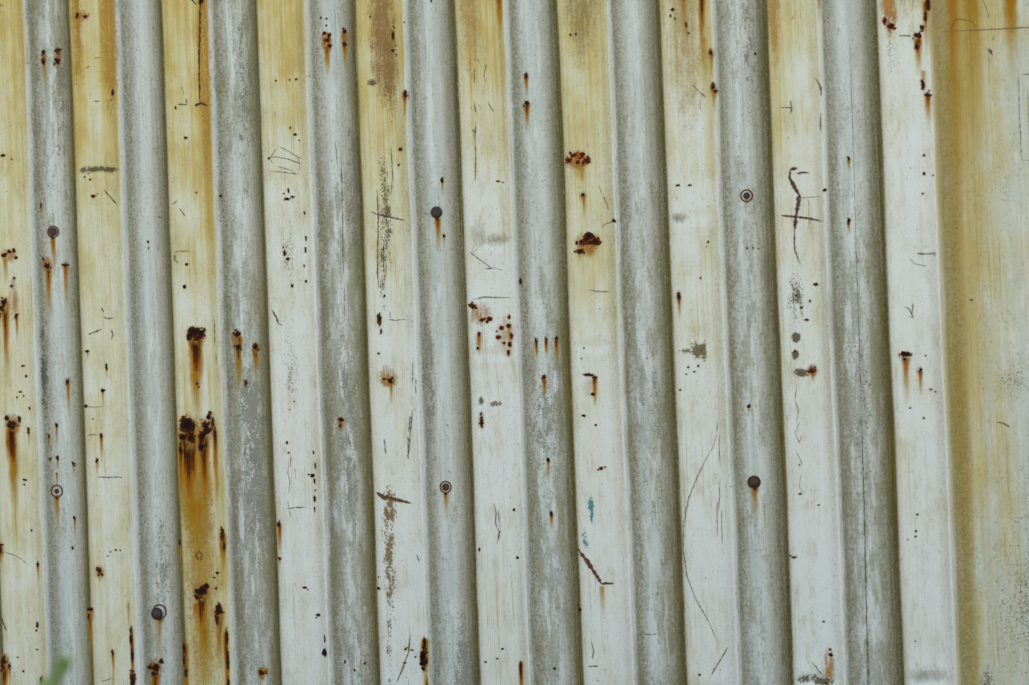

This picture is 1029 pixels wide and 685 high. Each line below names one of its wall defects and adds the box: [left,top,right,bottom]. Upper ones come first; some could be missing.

corrosion [882,0,896,31]
corrosion [947,0,977,87]
corrosion [1006,0,1016,28]
corrosion [565,151,591,173]
corrosion [574,232,602,256]
corrosion [0,248,19,361]
corrosion [186,326,206,390]
corrosion [468,301,513,357]
corrosion [4,406,30,486]
corrosion [175,411,218,534]
corrosion [129,626,164,685]
corrosion [193,583,230,685]